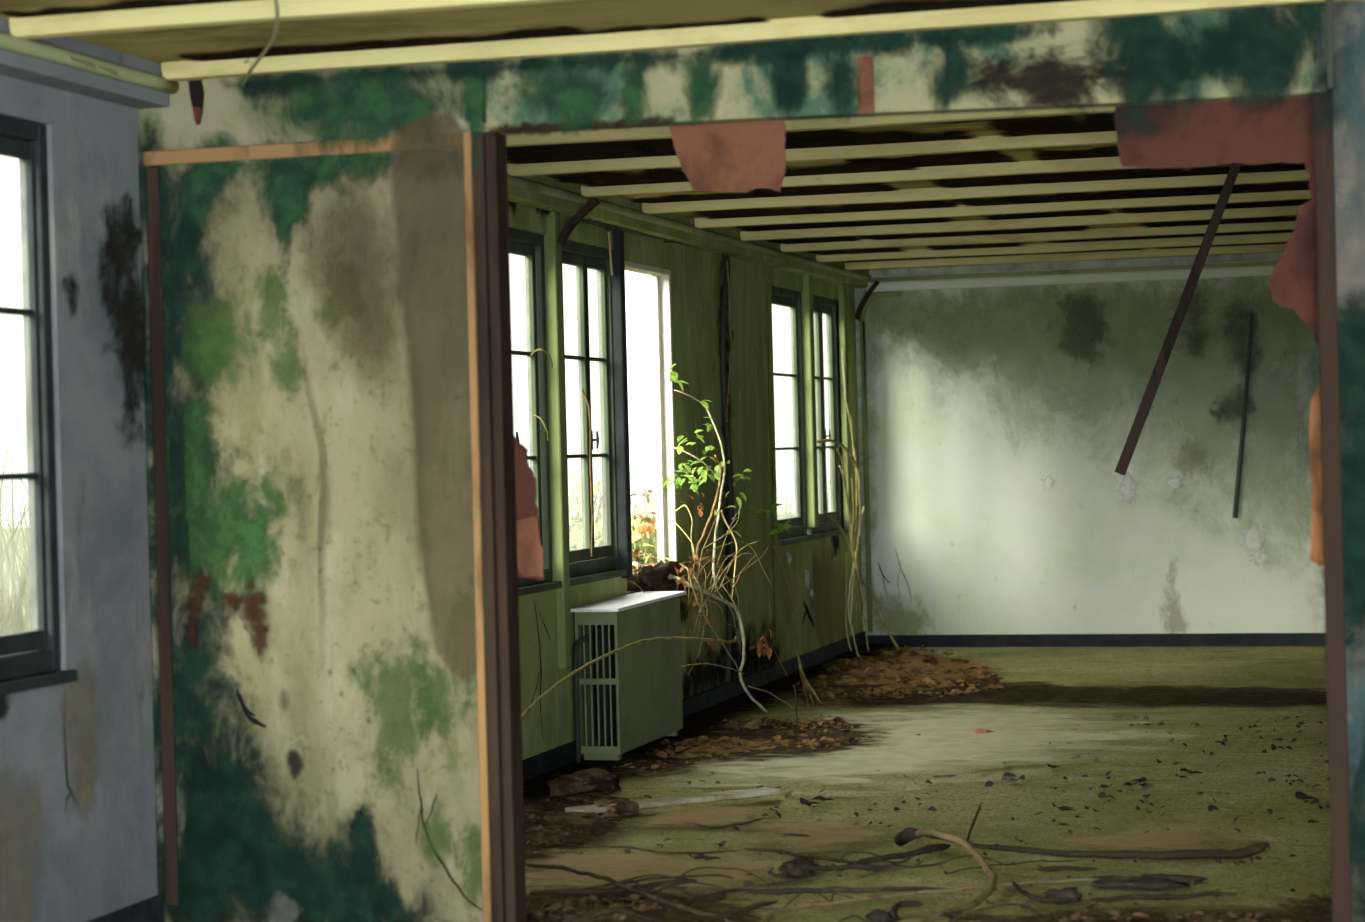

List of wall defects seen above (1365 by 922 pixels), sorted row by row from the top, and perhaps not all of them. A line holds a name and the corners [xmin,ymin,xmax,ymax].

water stain [0,0,251,18]
water stain [179,18,768,61]
water stain [685,0,1336,149]
water stain [507,138,1311,263]
water stain [867,277,1305,377]
water stain [100,50,679,922]
water stain [1338,295,1365,647]
water stain [683,457,780,701]
water stain [874,598,922,635]